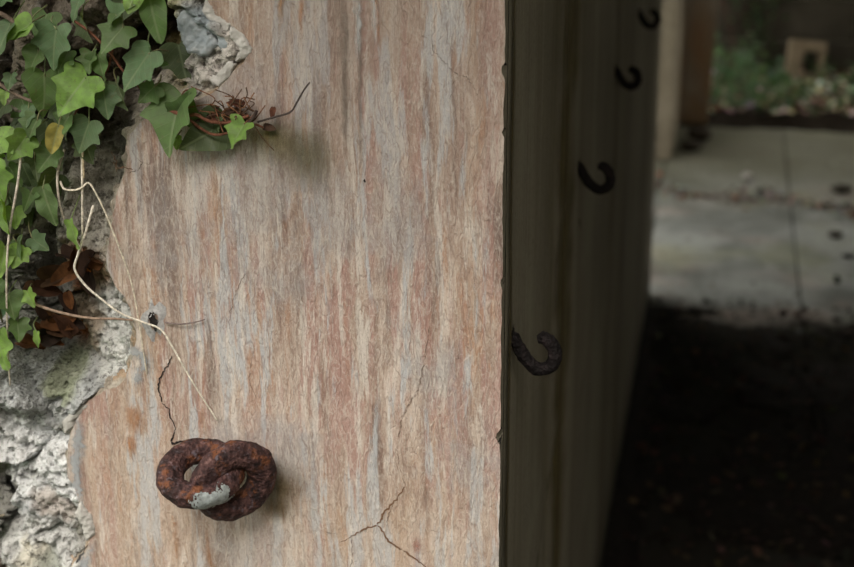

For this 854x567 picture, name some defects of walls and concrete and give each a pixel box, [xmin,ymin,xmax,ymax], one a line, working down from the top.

flaking render [176,0,253,87]
spalling [140,298,166,342]
flaking render [62,403,87,434]
crack [157,356,188,445]
crack [398,330,429,434]
flaking render [75,501,95,539]
crack [327,487,426,567]